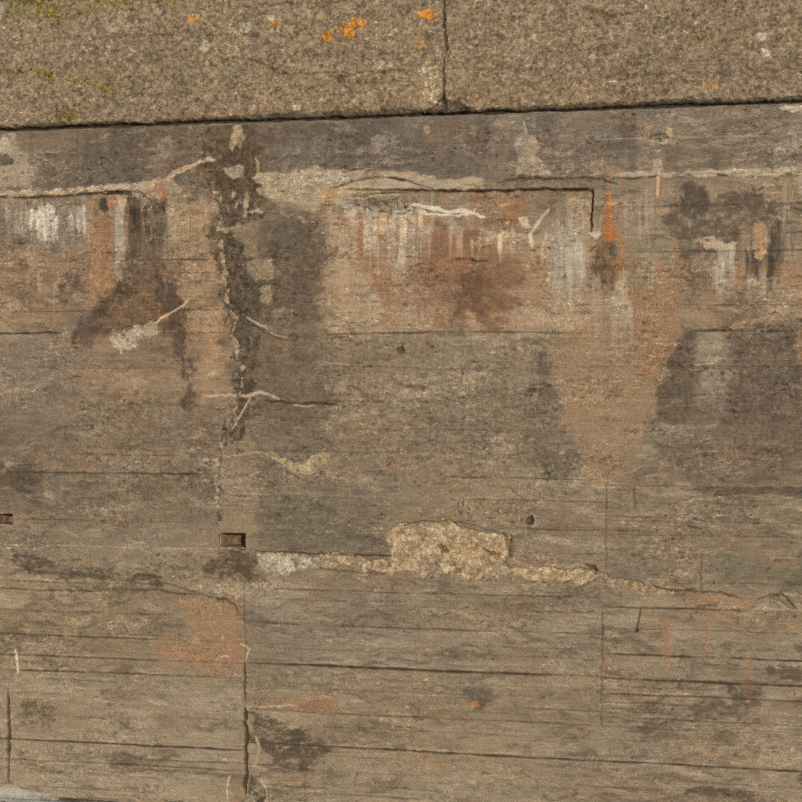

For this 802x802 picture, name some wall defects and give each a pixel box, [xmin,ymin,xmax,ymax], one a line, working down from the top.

crack [232,0,471,113]
damp [0,132,201,420]
crack [0,155,220,214]
damp [174,123,636,452]
crack [329,165,802,240]
corrosion [599,180,625,288]
damp [655,178,787,310]
crack [202,389,345,537]
corrosion [543,278,684,486]
damp [651,316,802,465]
spalling [189,516,677,601]
crack [218,643,254,798]